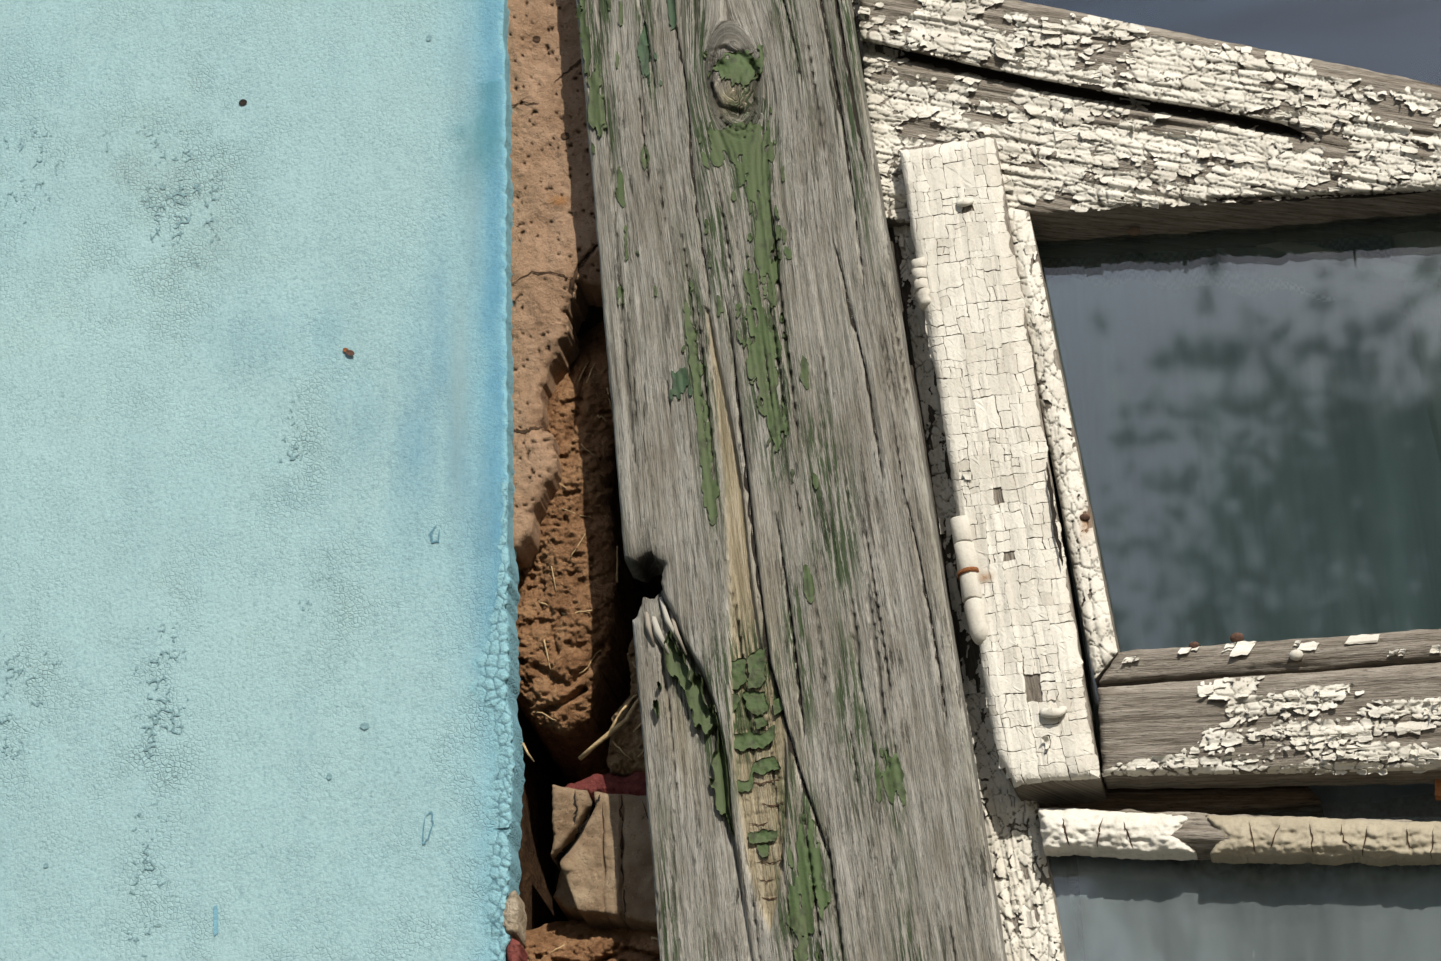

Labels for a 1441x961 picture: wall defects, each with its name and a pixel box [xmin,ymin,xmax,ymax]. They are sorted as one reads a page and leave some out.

peeling [966,21,1073,80]
peeling [1239,58,1365,129]
peeling [1042,101,1096,141]
peeling [1386,120,1419,173]
peeling [1104,182,1177,210]
peeling [699,107,792,453]
crack [783,0,1311,726]
rust [957,567,986,581]
peeling [1222,641,1257,657]
peeling [1294,640,1319,650]
peeling [1344,634,1406,656]
peeling [1197,677,1441,775]